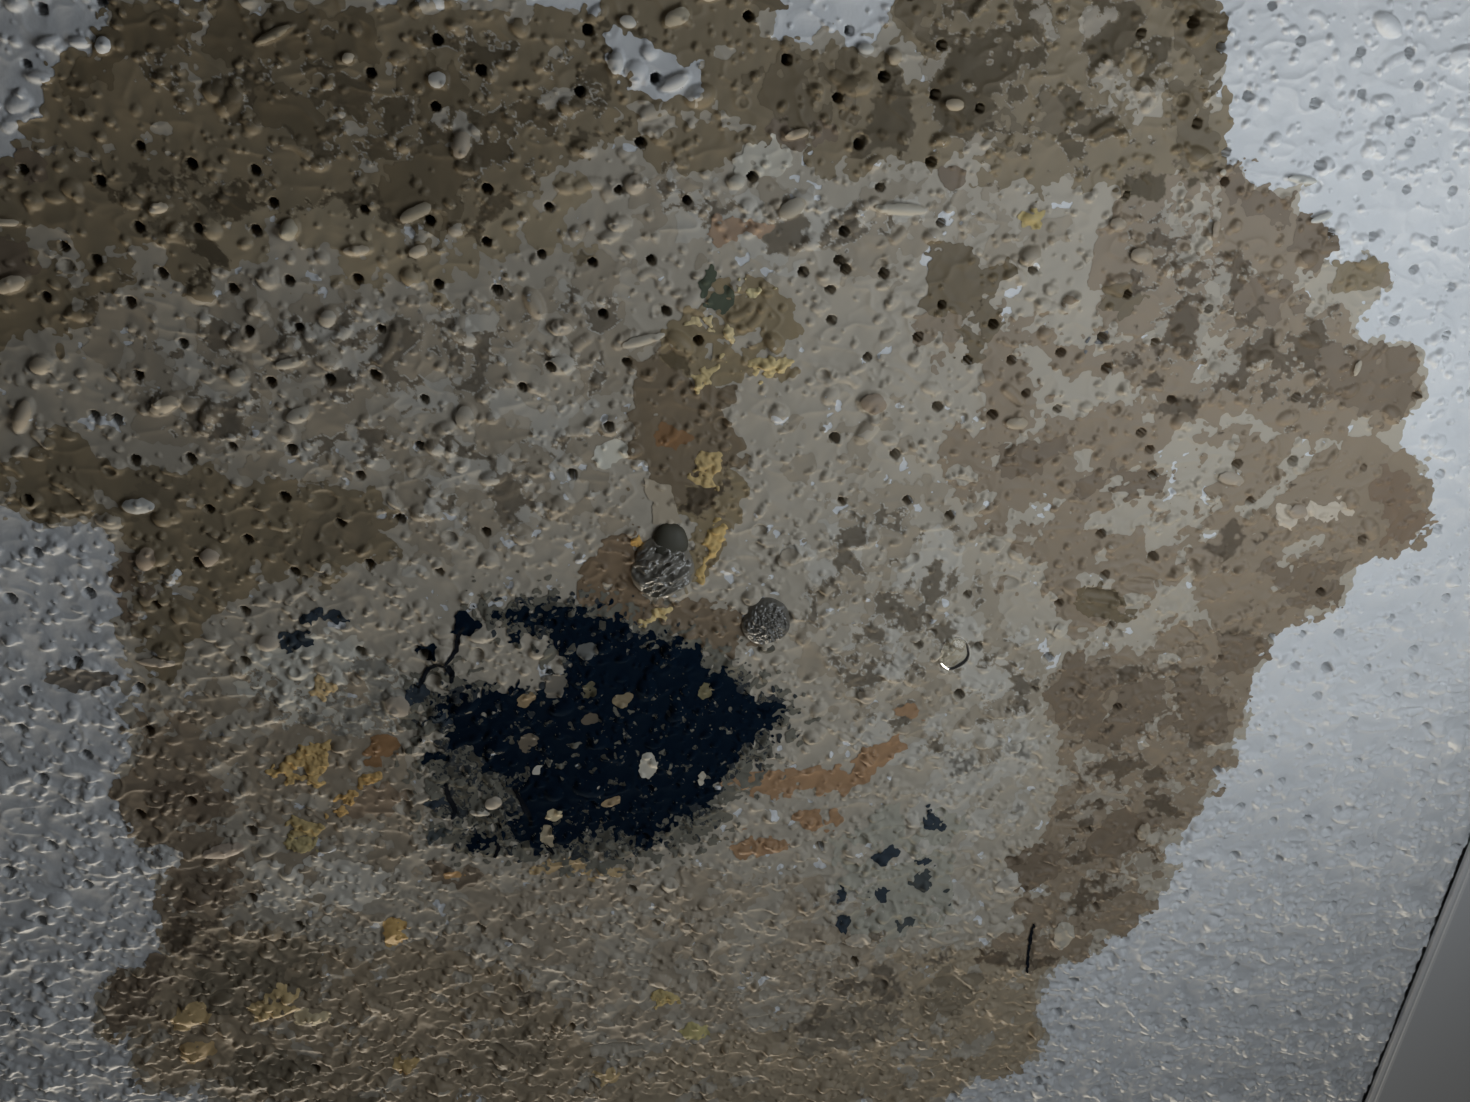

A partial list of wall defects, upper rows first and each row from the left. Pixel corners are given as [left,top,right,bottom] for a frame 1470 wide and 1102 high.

leakage [336,669,379,708]
leakage [875,887,890,903]